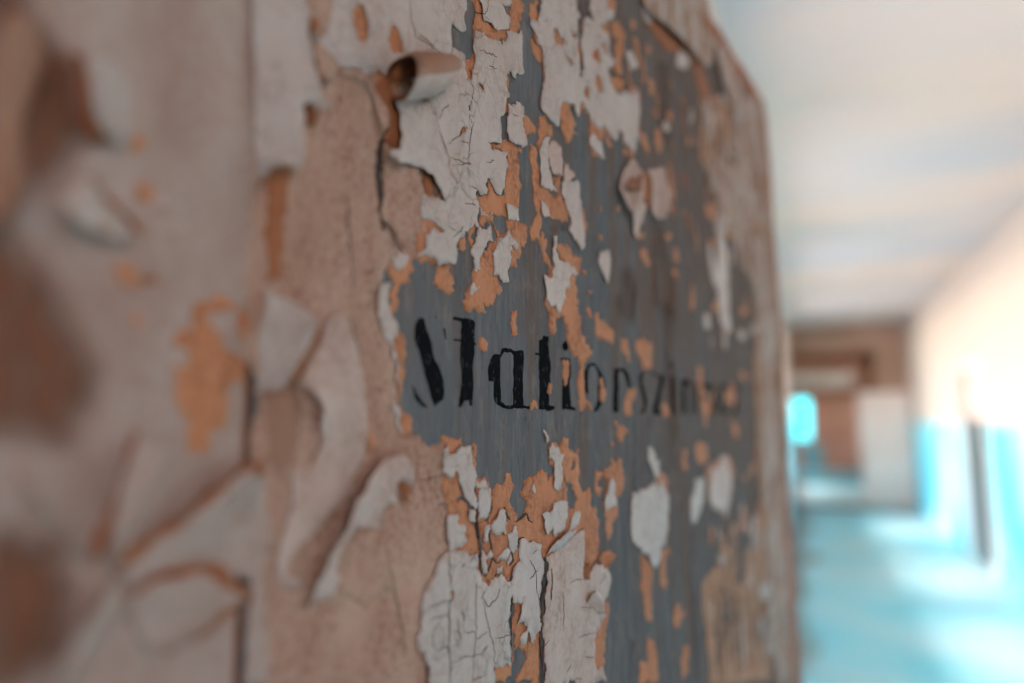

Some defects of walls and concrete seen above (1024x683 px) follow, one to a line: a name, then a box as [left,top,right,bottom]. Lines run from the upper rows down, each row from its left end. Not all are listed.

crack [375,123,391,231]
crack [440,50,497,238]
peeling [172,0,800,683]
crack [385,500,605,683]